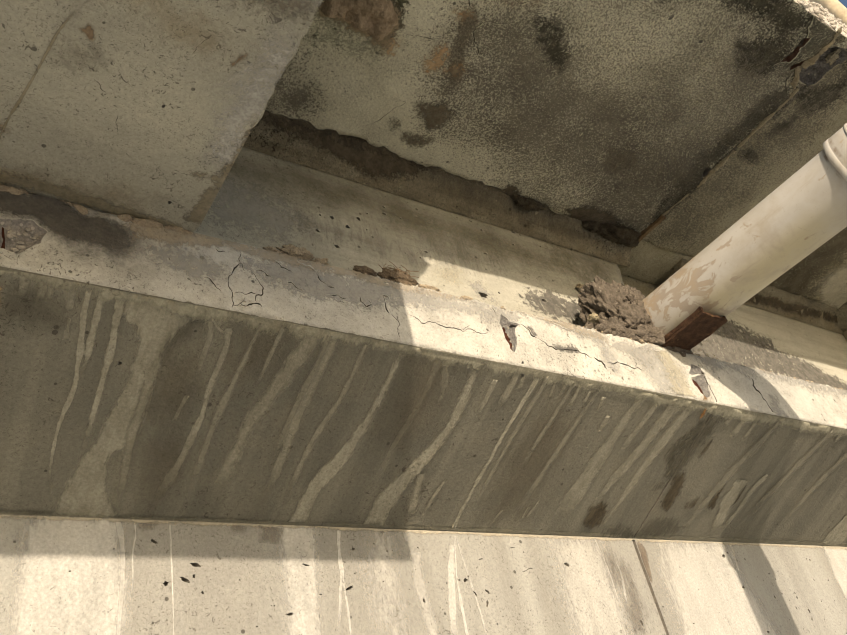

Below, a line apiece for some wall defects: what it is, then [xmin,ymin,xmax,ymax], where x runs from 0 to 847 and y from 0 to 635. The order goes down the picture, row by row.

spalling [782,27,847,89]
water stain [0,44,330,255]
water stain [392,0,847,254]
spalling [0,219,47,254]
crack [206,249,486,335]
spalling [499,313,519,352]
crack [509,324,641,370]
spalling [689,364,711,398]
water stain [769,227,847,308]
water stain [0,257,847,635]